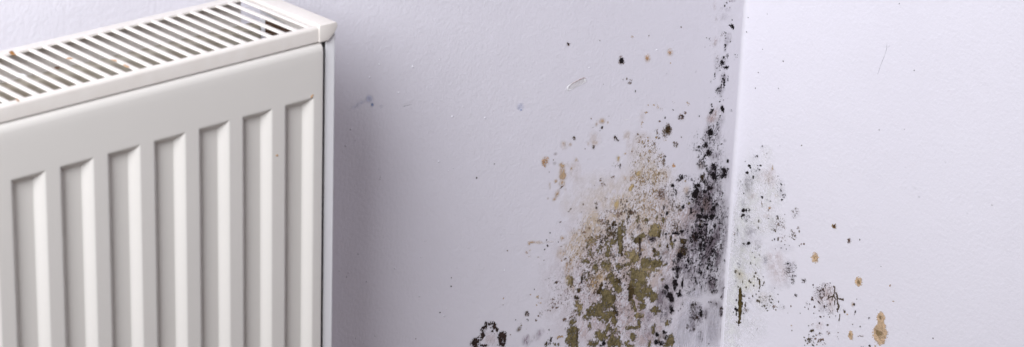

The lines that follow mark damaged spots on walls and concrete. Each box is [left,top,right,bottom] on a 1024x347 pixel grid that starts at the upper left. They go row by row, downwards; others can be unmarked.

water stain [470,24,887,347]